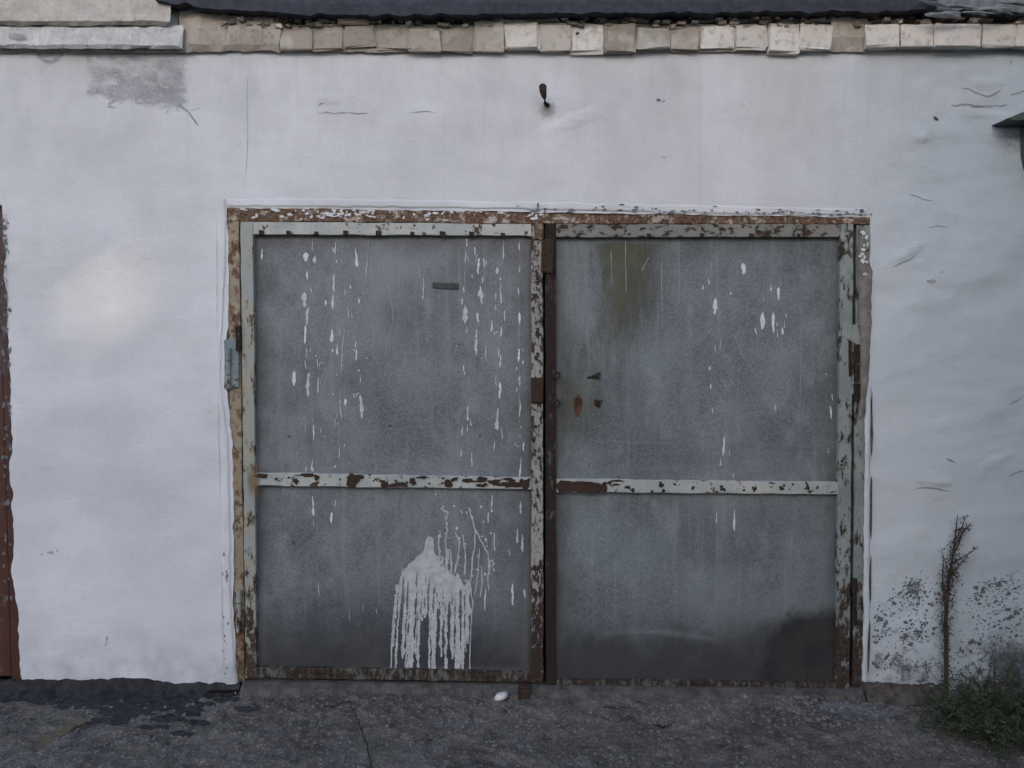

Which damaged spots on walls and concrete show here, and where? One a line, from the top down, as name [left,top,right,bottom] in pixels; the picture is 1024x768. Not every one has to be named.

peeling [89,58,184,114]
peeling [527,203,575,221]
rust [254,473,531,490]
rust [556,477,635,493]